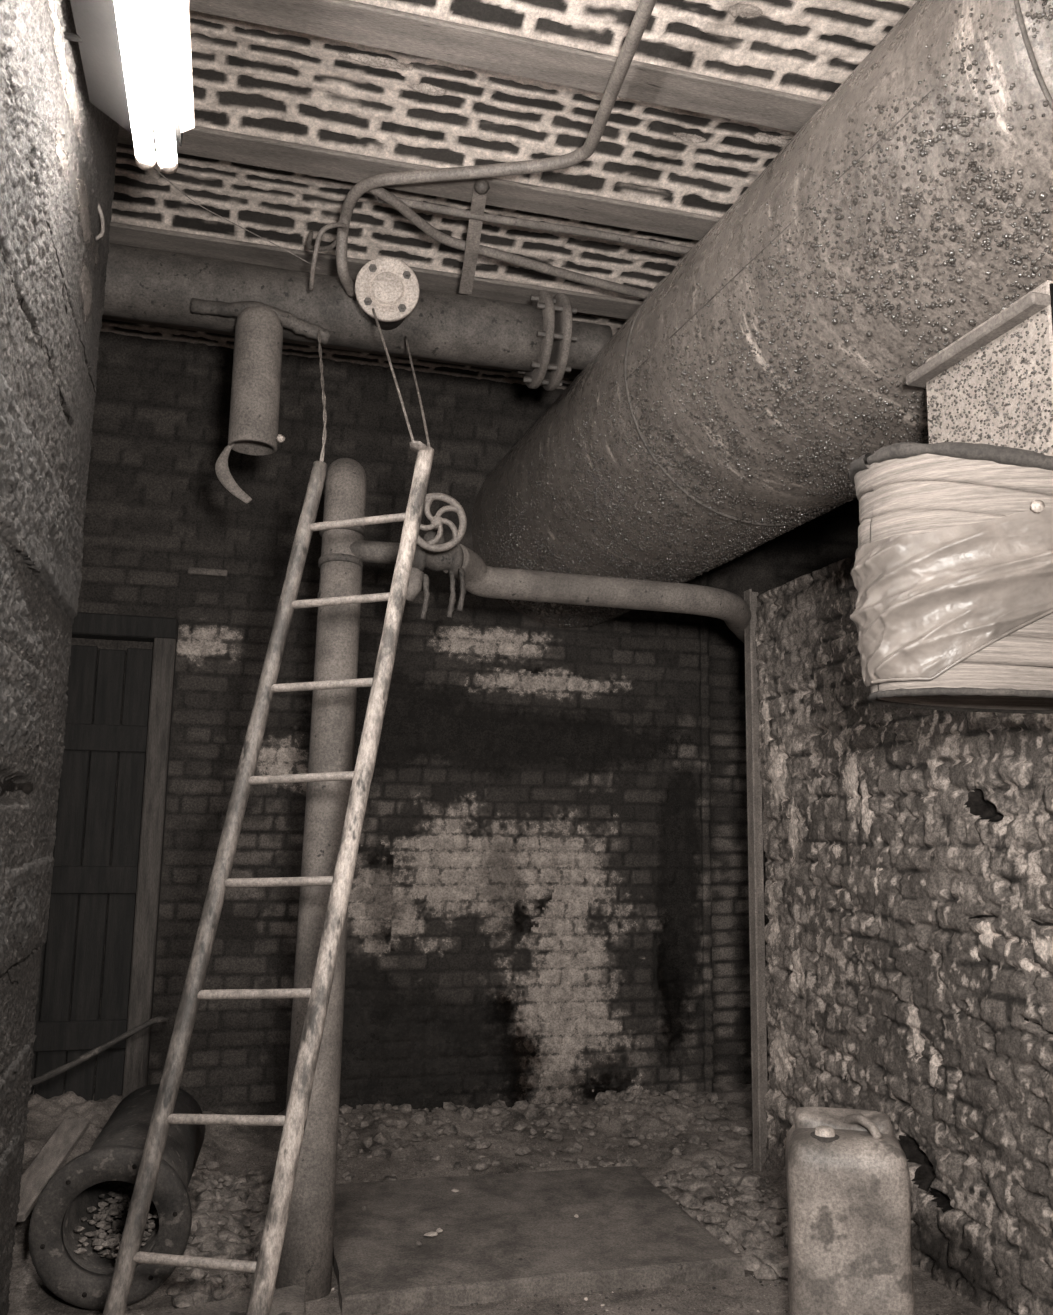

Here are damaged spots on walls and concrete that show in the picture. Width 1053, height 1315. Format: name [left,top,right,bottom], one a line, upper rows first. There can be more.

crack [0,243,70,423]
crack [34,182,96,393]
spalling [964,789,1004,822]
damp [651,761,700,1042]
damp [339,960,517,1112]
spalling [898,1135,954,1213]